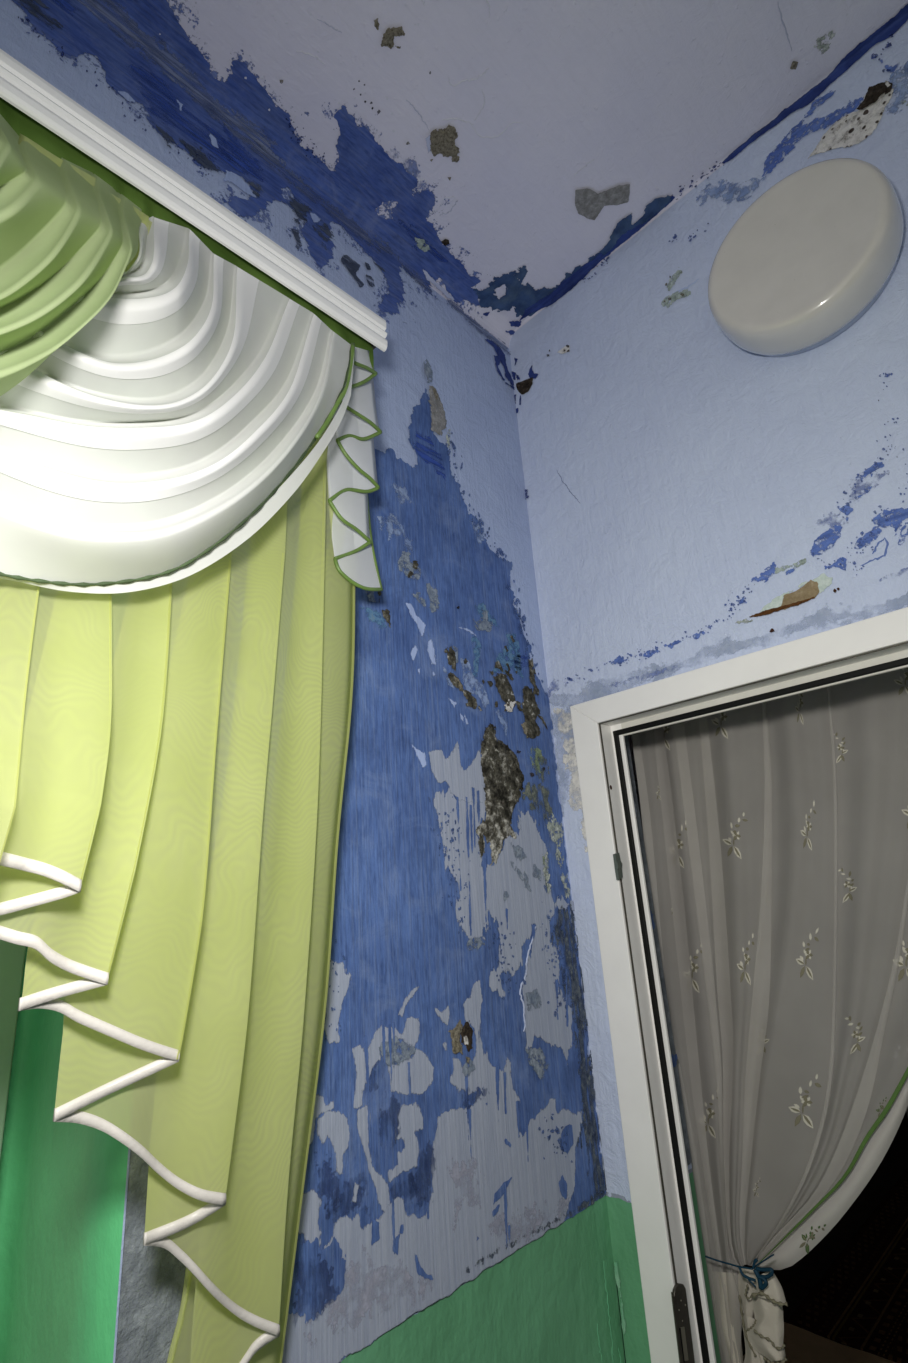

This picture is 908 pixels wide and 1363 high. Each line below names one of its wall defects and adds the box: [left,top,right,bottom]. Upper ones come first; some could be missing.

peeling [12,0,908,413]
water stain [466,748,607,1273]
peeling [282,359,908,1363]
water stain [582,663,680,700]
water stain [709,637,752,656]
water stain [888,593,908,610]